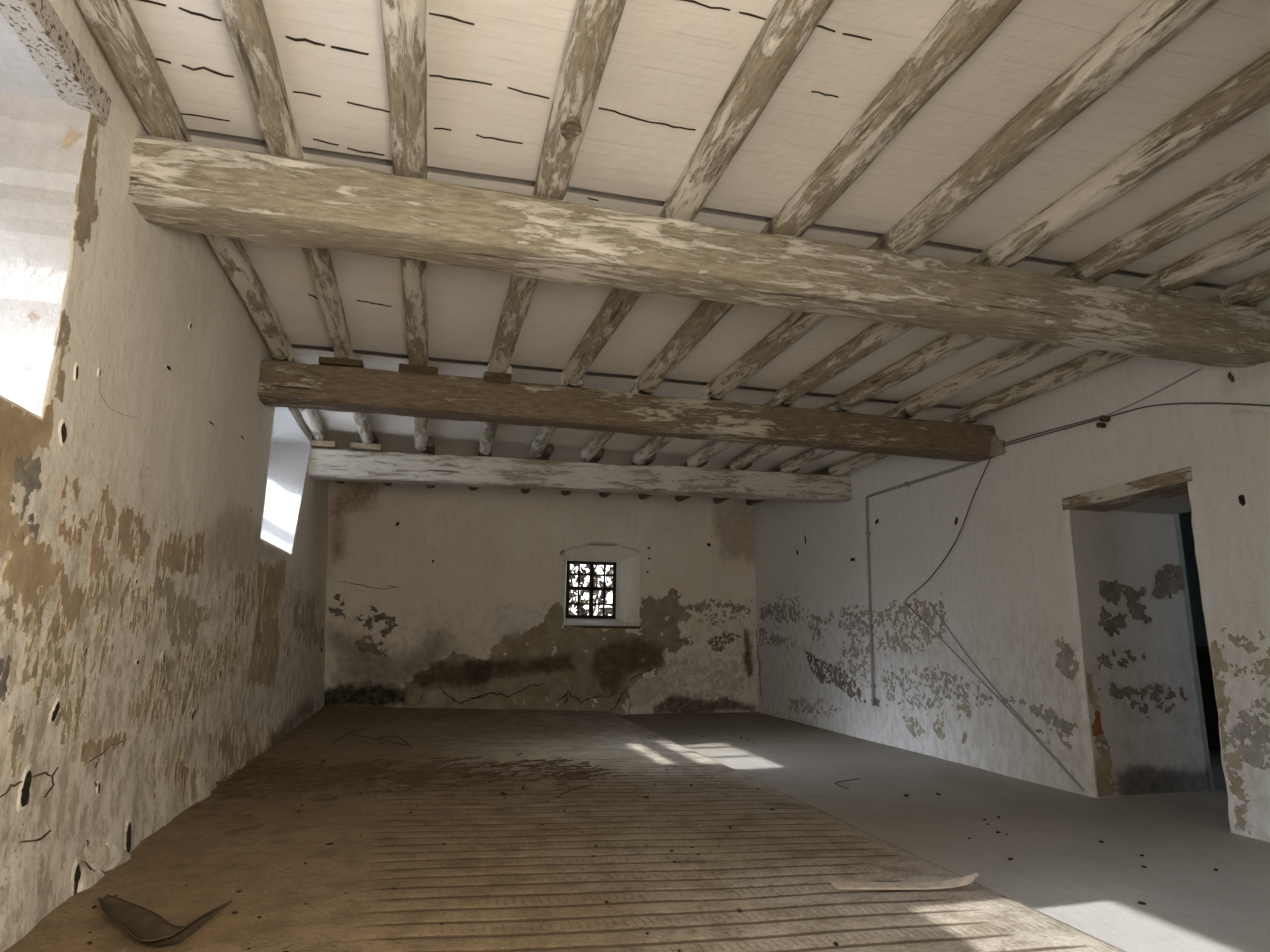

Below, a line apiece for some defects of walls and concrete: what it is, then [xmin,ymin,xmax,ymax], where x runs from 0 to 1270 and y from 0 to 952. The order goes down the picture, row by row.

spalling [73,112,102,252]
peeling [0,310,398,814]
leakage [419,657,571,687]
leakage [743,630,753,675]
flaking render [401,564,1188,797]
leakage [287,685,405,726]
leakage [654,696,753,713]
flaking render [123,815,132,854]
flaking render [70,855,82,896]